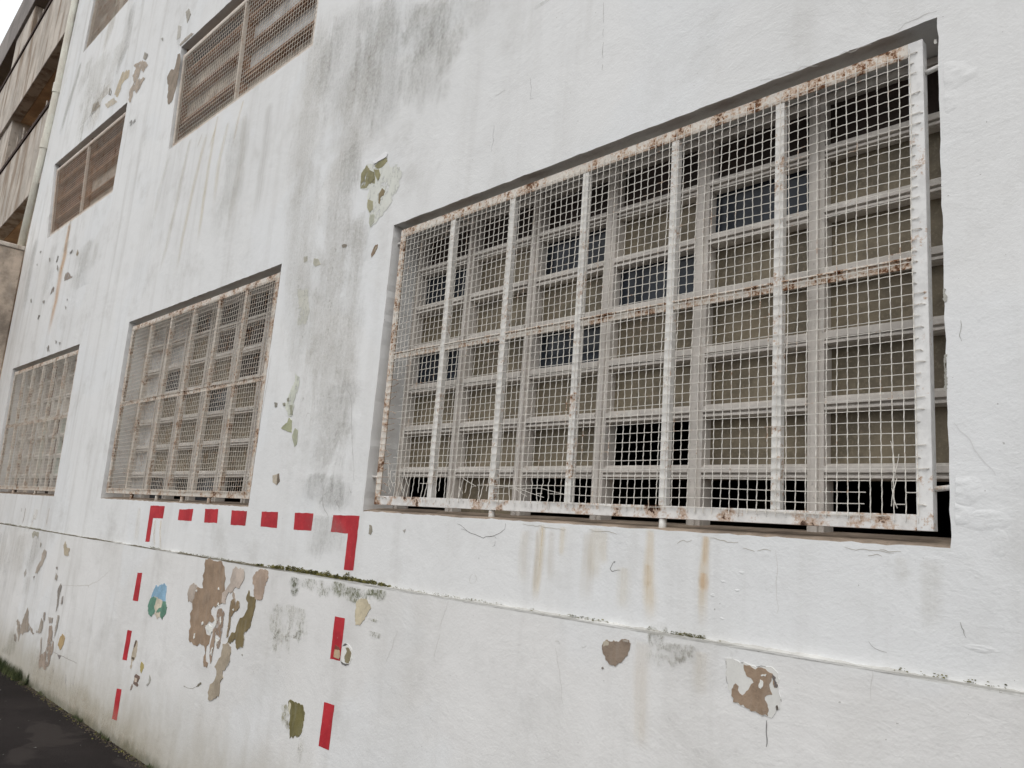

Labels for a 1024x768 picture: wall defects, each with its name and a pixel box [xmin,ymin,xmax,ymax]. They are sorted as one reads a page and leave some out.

peeling [91,52,148,113]
peeling [167,9,194,104]
peeling [360,152,402,228]
peeling [274,374,300,447]
peeling [24,531,47,579]
peeling [14,567,65,670]
peeling [148,583,167,619]
peeling [184,558,269,701]
peeling [355,598,371,625]
peeling [601,639,631,669]
peeling [725,658,781,718]
peeling [288,700,305,738]